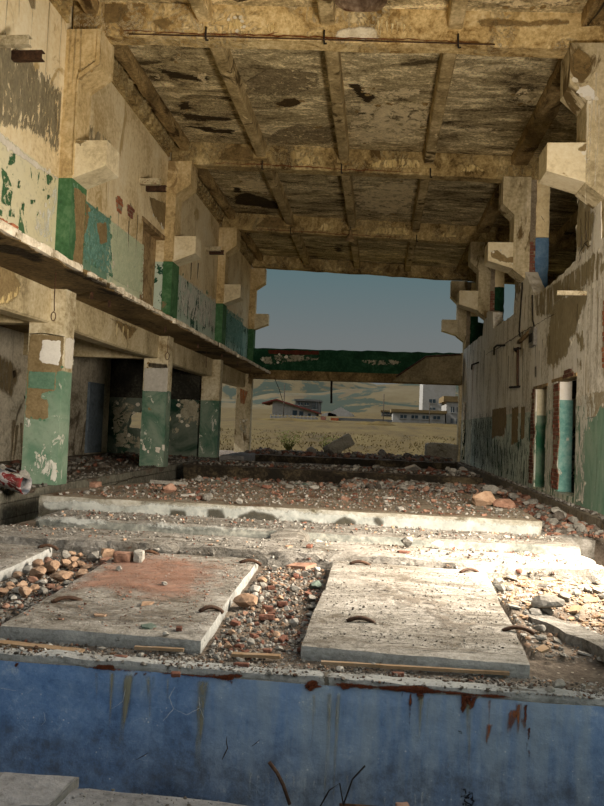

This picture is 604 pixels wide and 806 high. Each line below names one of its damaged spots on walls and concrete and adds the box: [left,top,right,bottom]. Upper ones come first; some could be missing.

water stain [0,48,62,151]
peeling [0,132,58,242]
peeling [25,334,74,427]
spalling [490,199,604,504]
peeling [25,454,59,481]
corrosion [304,680,322,691]
corrosion [336,683,509,713]
corrosion [508,704,530,739]